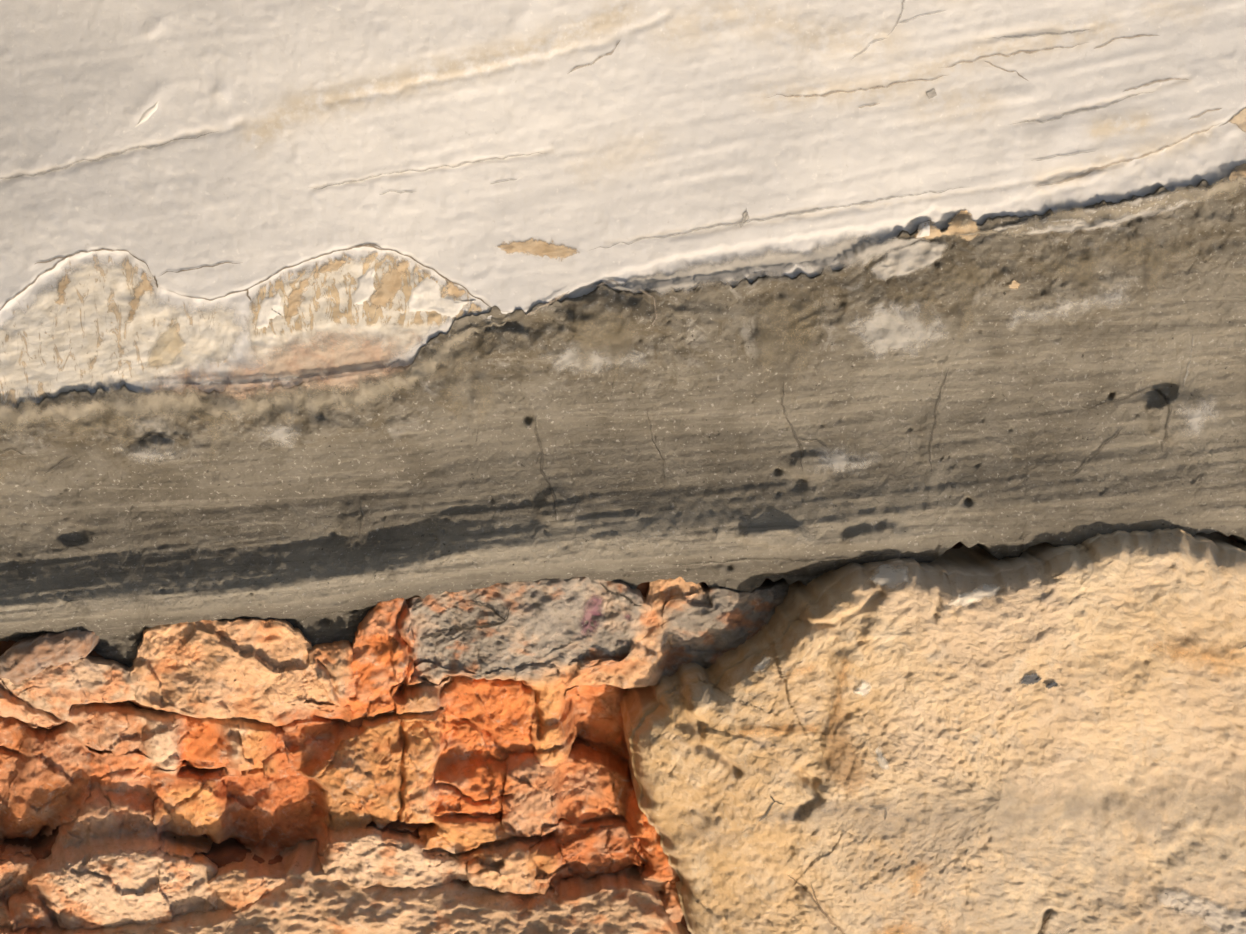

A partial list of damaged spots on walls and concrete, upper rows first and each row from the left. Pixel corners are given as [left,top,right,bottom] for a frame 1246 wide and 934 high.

crack [853,0,942,58]
crack [767,29,1159,108]
crack [0,134,206,179]
crack [314,153,543,195]
crack [1014,78,1188,124]
crack [1031,108,1232,187]
spalling [1230,108,1246,132]
peeling [0,252,482,410]